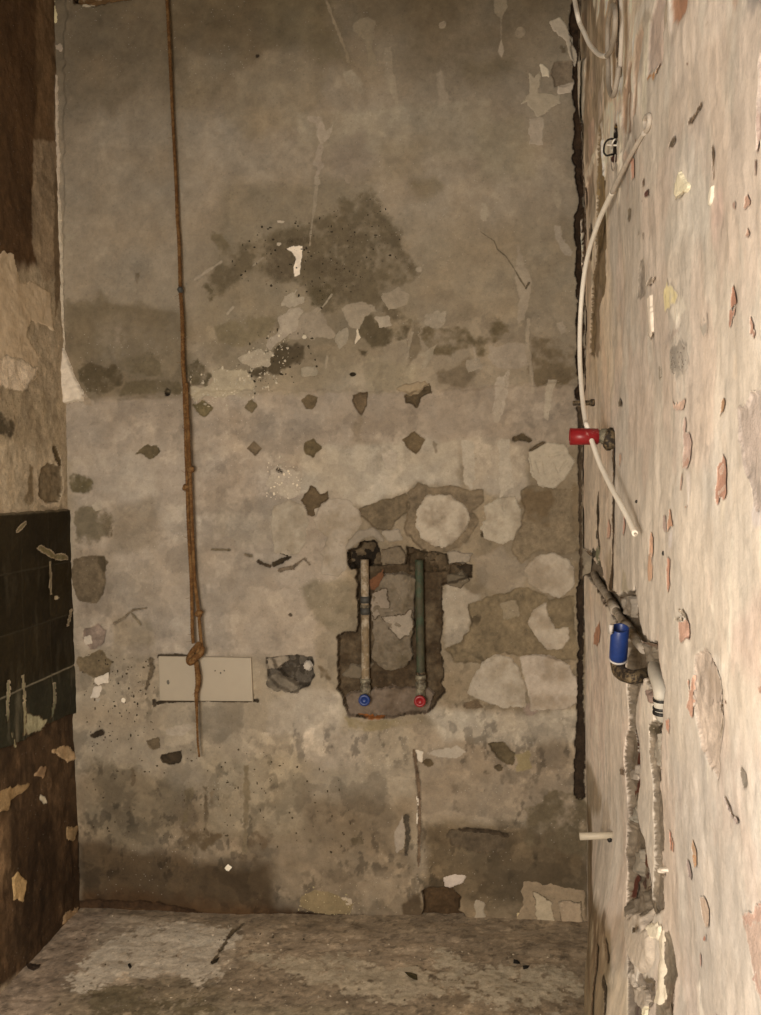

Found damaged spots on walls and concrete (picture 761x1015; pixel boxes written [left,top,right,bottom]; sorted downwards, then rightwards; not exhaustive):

peeling [0,75,94,407]
flaking render [276,242,303,277]
water stain [64,184,516,407]
water stain [524,333,578,389]
flaking render [358,439,485,553]
flaking render [445,587,578,664]
spalling [265,654,332,694]
peeling [686,647,726,780]
water stain [163,749,278,856]
water stain [521,788,588,860]
water stain [298,886,360,915]
flaking render [627,929,678,1015]